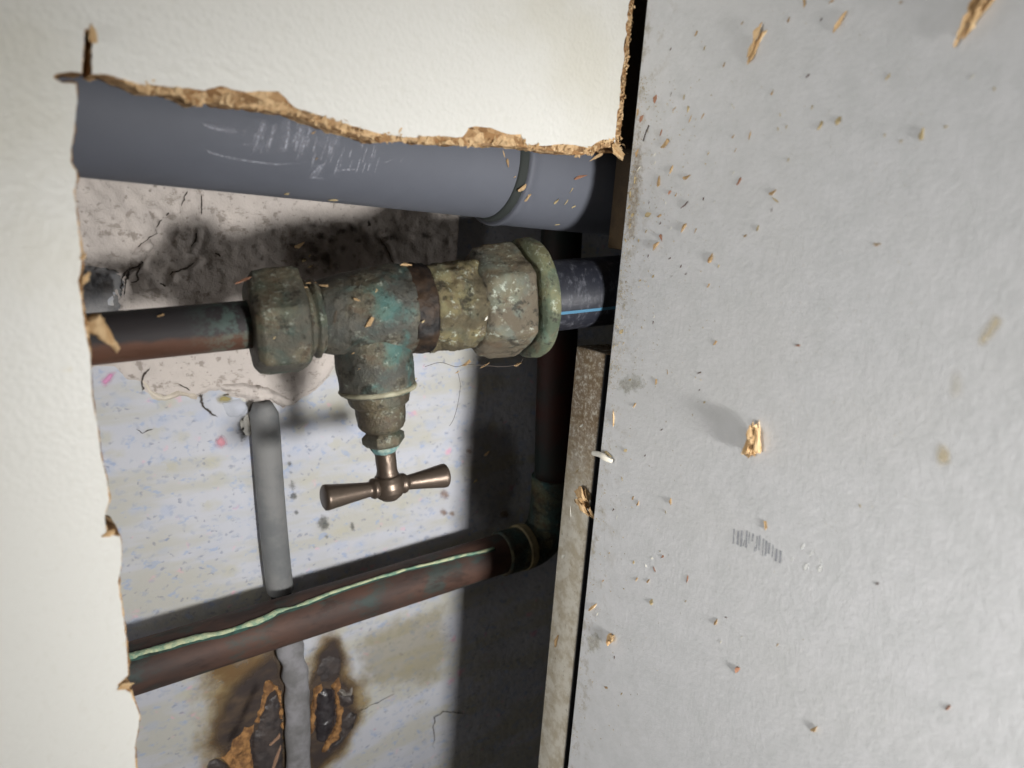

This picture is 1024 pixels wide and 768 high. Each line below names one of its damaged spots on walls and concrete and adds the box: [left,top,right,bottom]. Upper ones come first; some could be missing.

crack [120,192,221,295]